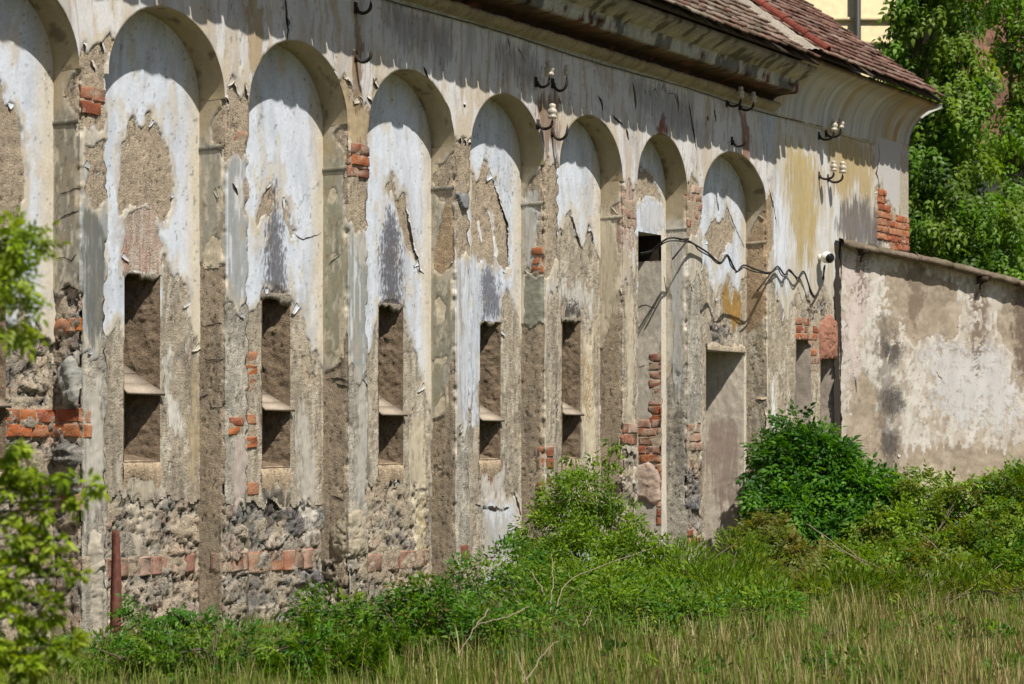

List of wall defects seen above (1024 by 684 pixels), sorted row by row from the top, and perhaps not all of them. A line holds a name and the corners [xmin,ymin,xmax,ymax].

crack [284,0,292,40]
flaking render [0,81,24,228]
leakage [761,113,885,393]
flaking render [6,34,841,651]
leakage [883,339,902,362]
leakage [883,388,903,416]
flaking render [840,370,1024,517]
flaking render [997,297,1024,394]